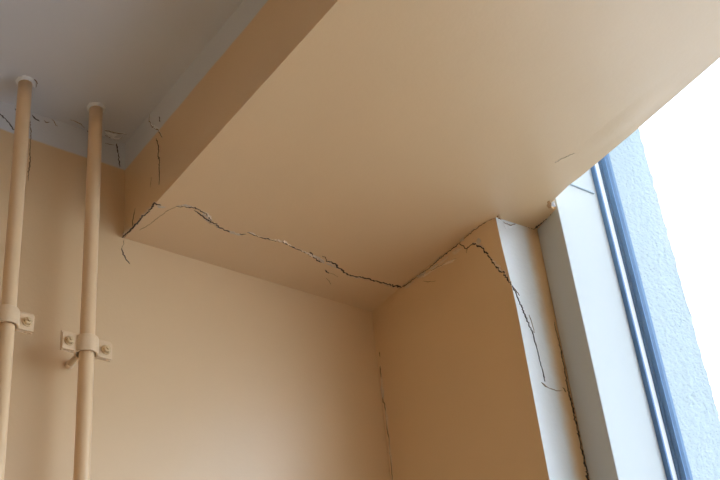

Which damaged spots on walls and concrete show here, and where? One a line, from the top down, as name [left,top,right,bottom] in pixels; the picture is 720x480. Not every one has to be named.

crack [0,109,57,178]
crack [149,114,162,185]
crack [121,202,589,480]